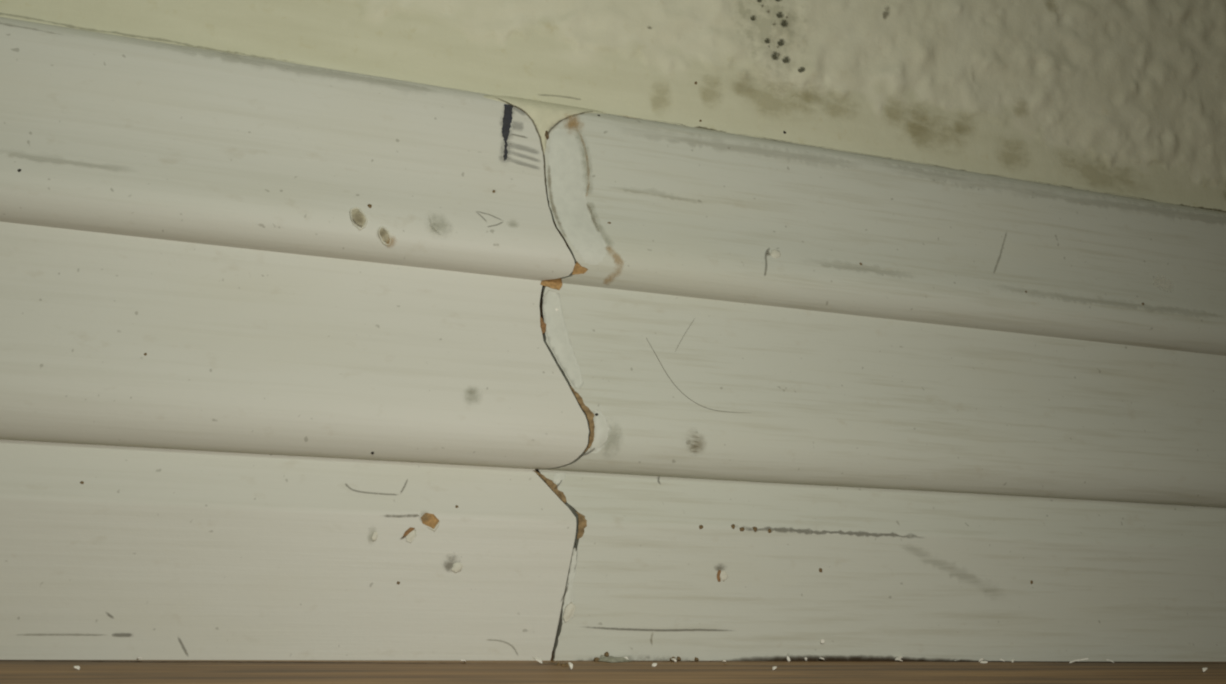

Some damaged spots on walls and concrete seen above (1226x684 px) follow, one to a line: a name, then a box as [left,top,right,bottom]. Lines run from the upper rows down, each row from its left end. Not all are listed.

damp [757,0,805,72]
crack [540,186,588,335]
crack [570,386,595,452]
peeling [402,513,440,543]
crack [533,469,587,539]